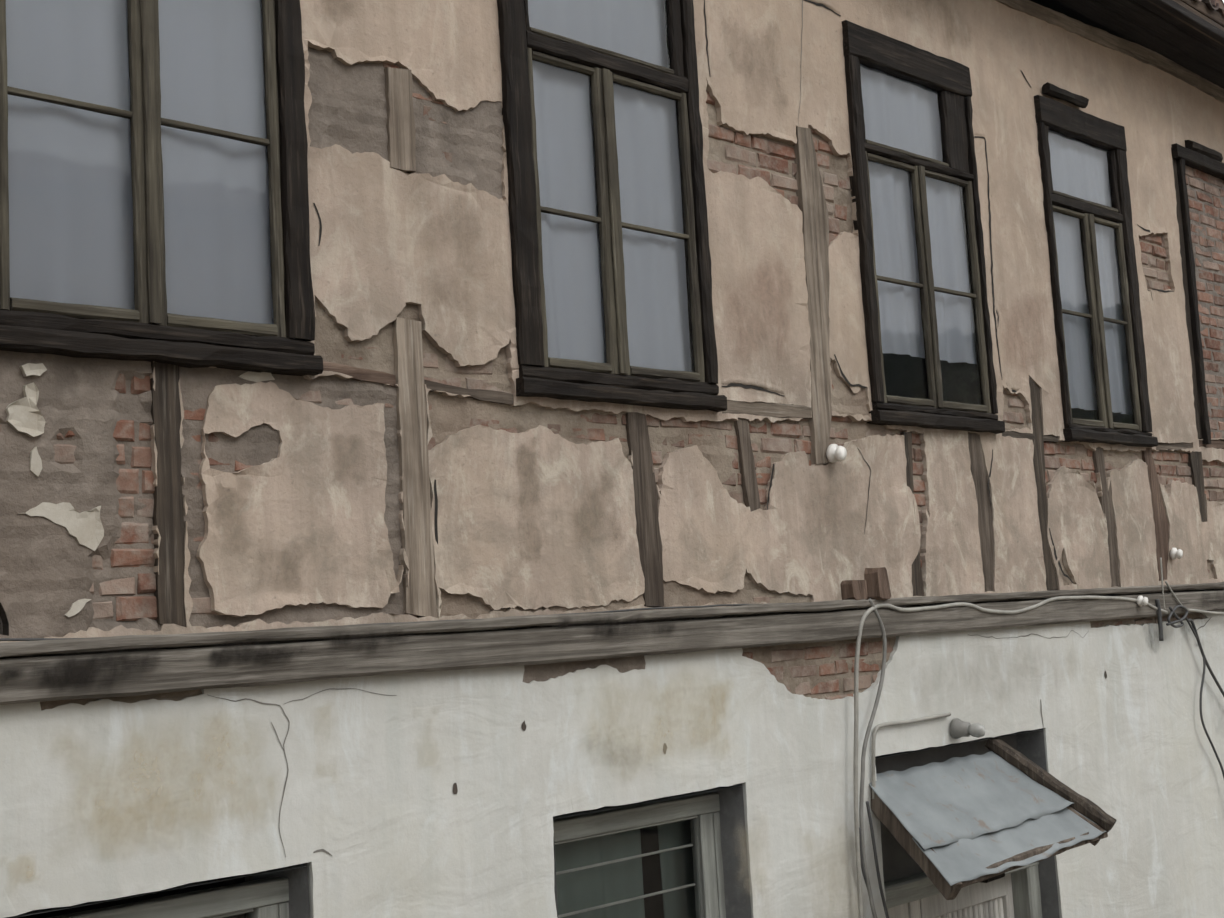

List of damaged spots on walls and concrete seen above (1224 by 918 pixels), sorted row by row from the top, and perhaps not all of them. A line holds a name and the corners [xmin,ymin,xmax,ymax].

crack [704,0,714,78]
crack [798,0,841,126]
spalling [308,46,504,199]
spalling [706,90,798,206]
spalling [0,350,160,638]
spalling [179,299,629,628]
spalling [645,415,829,510]
spalling [1044,441,1224,503]
spalling [440,574,811,619]
spalling [523,655,646,683]
spalling [742,636,896,700]
crack [208,688,397,857]